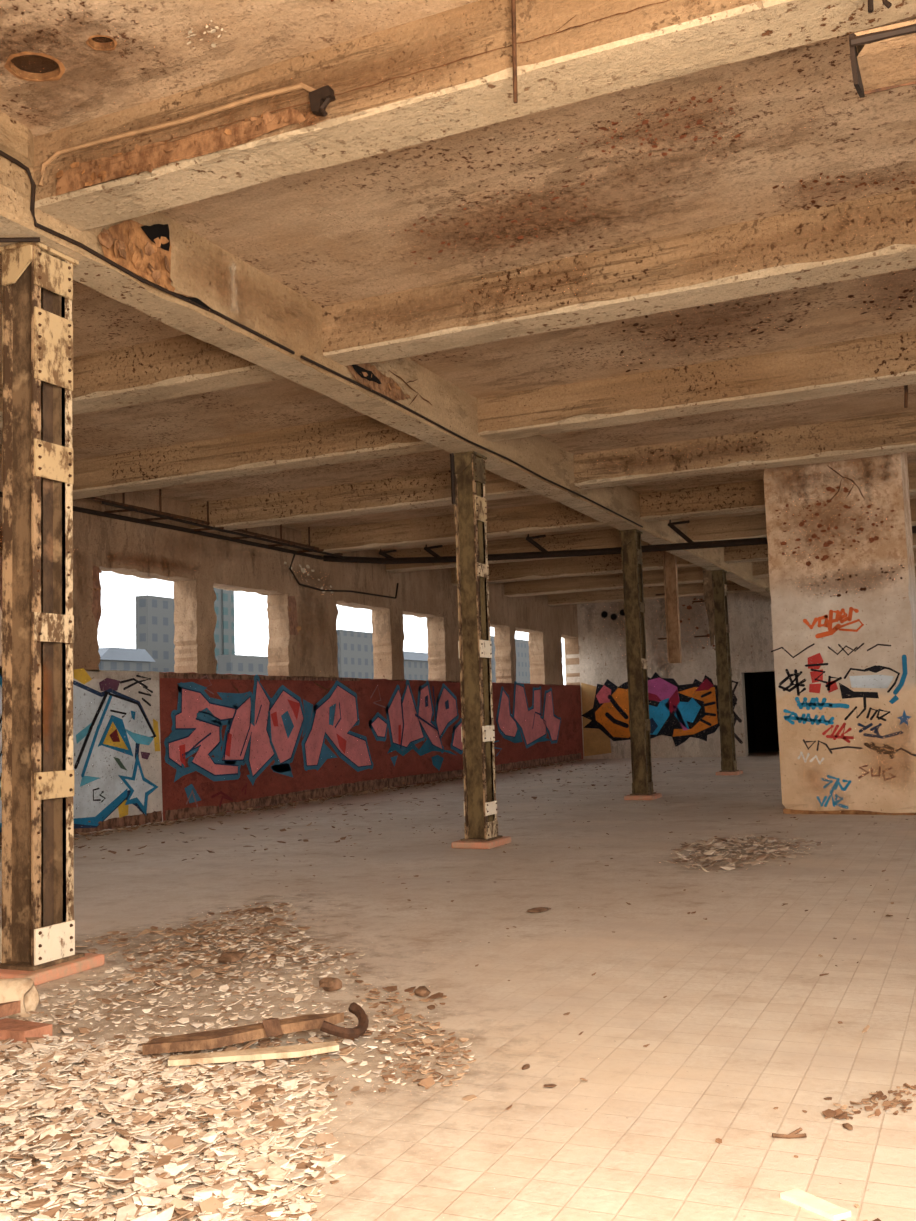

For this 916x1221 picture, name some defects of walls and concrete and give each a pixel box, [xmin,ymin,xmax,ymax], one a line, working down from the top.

spalling [55,109,306,196]
spalling [98,220,215,312]
peeling [775,486,904,597]